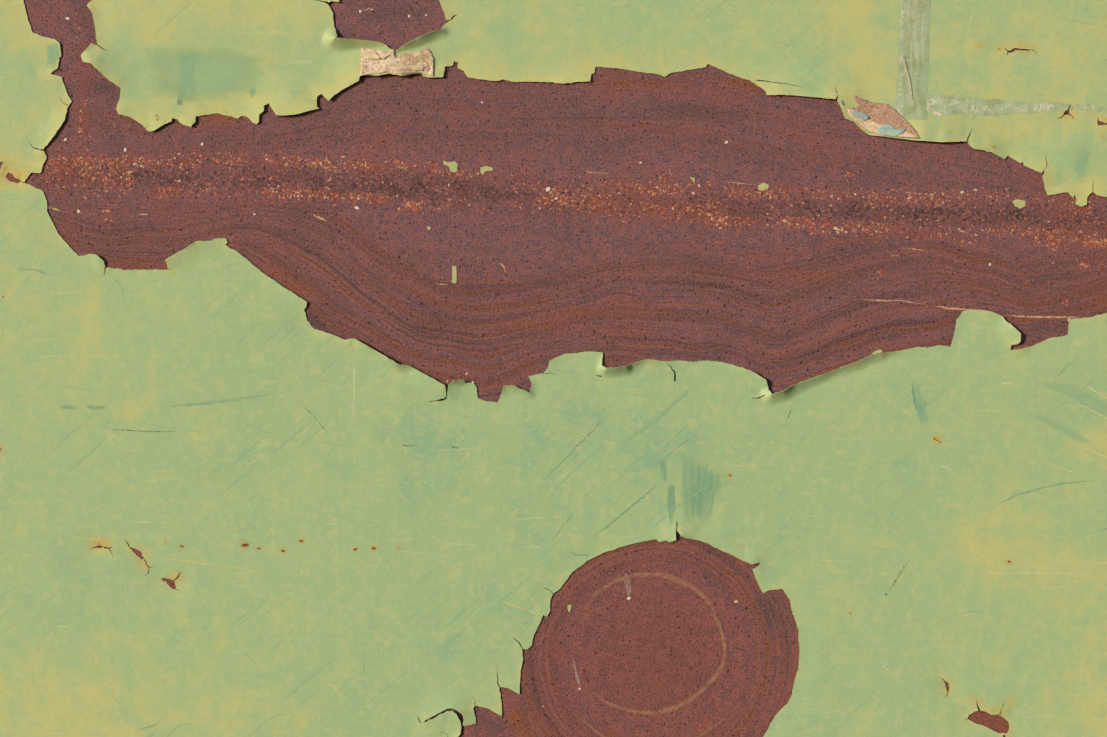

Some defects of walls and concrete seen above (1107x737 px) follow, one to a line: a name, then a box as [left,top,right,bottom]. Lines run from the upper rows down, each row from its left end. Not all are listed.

peeling [0,0,1107,425]
peeling [87,535,187,595]
peeling [398,507,822,737]
peeling [935,670,1020,737]